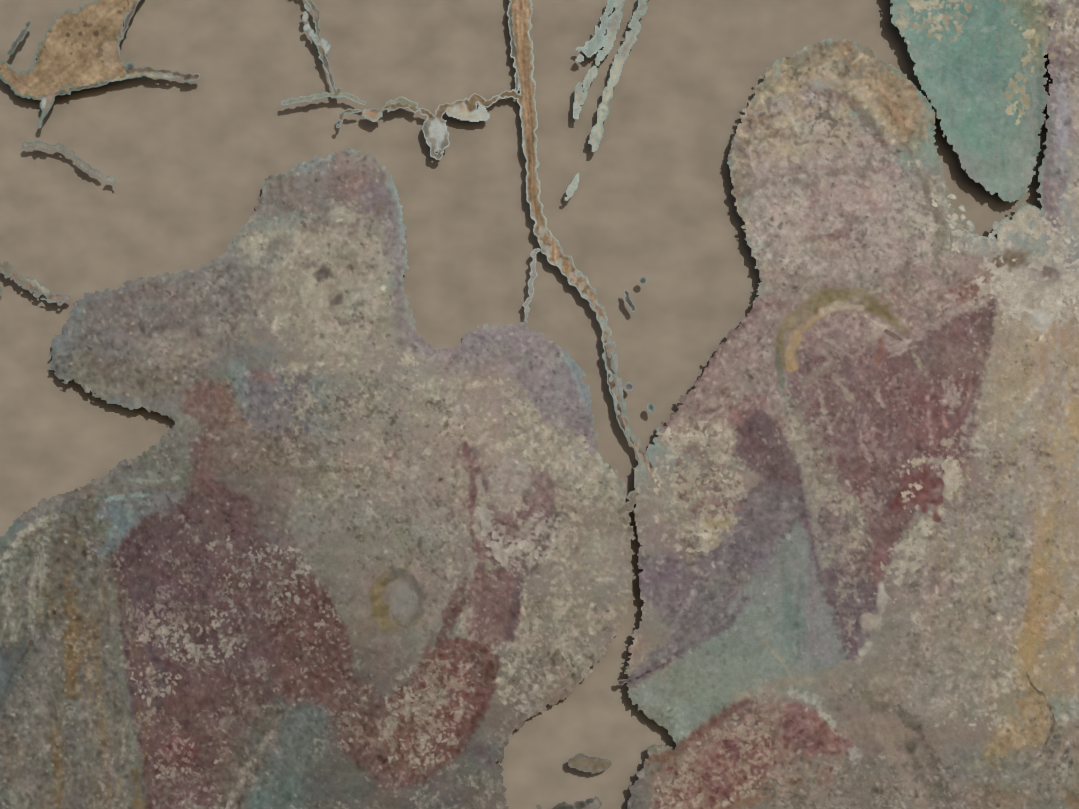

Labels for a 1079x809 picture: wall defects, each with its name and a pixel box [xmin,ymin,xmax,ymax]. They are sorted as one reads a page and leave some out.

spalling [0,0,200,128]
peeling [895,0,973,45]
peeling [997,0,1078,127]
crack [22,141,116,185]
crack [281,0,671,534]
flaking render [857,446,964,658]